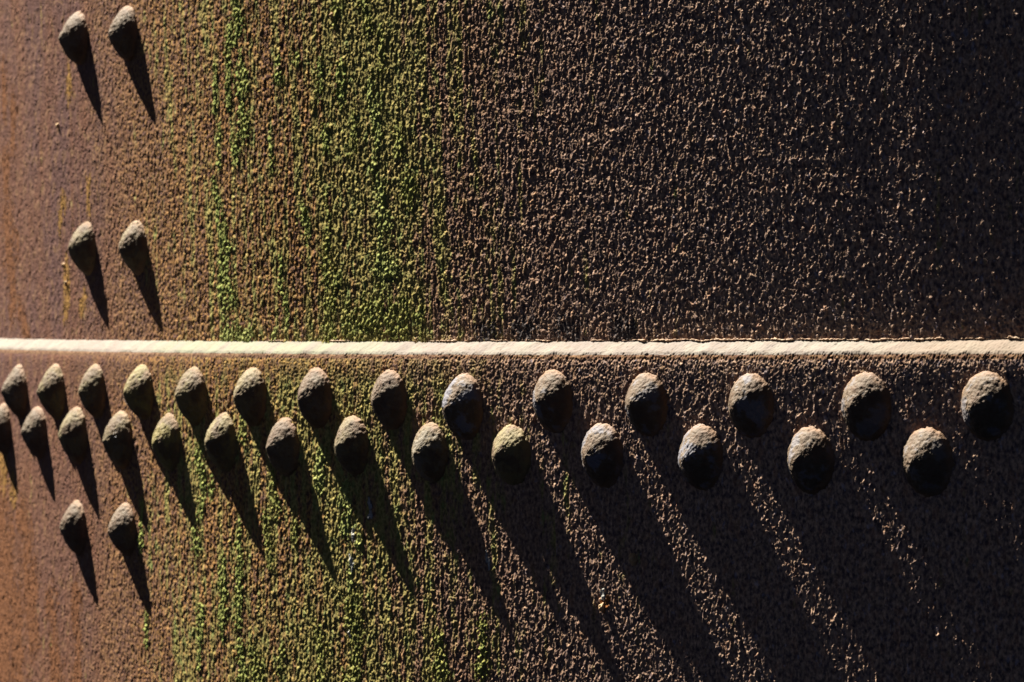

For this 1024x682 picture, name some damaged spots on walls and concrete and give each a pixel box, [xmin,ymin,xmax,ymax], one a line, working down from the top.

corrosion [0,54,30,339]
corrosion [62,252,88,323]
corrosion [0,452,18,512]
corrosion [599,594,610,614]